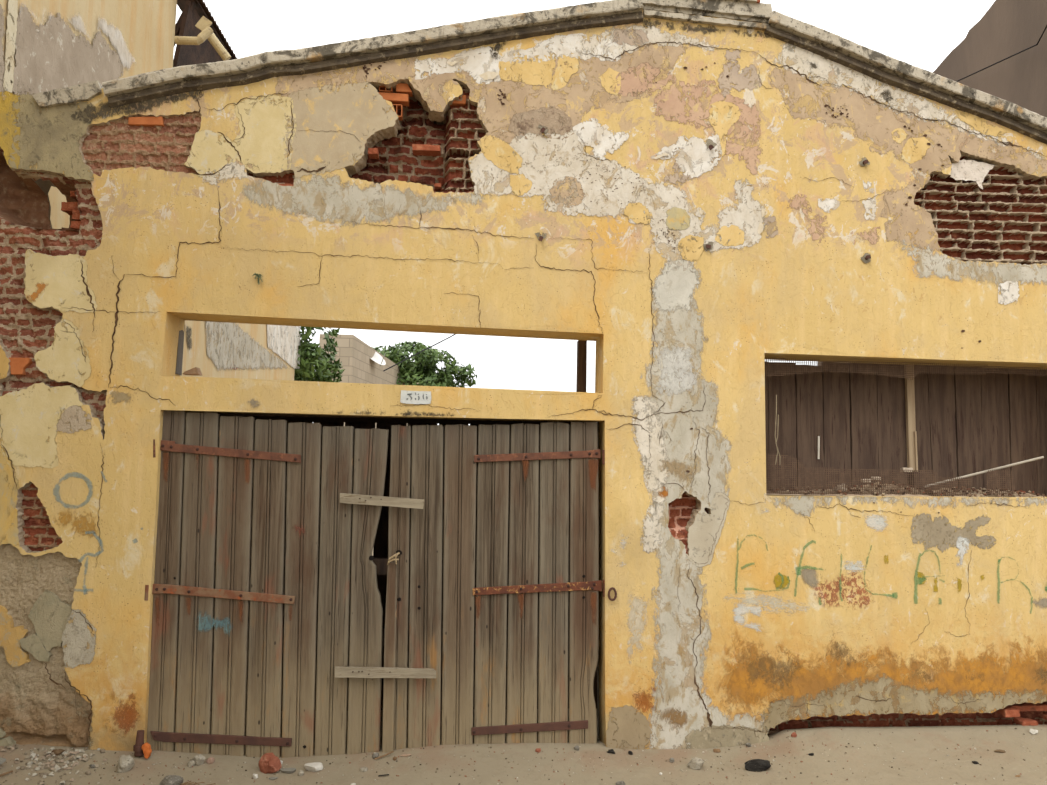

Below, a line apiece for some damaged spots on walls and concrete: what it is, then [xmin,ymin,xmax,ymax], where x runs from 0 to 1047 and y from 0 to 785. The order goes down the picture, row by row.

peeling [0,4,1047,434]
crack [60,93,770,738]
peeling [631,396,708,554]
spalling [0,483,97,748]
peeling [761,674,1047,735]